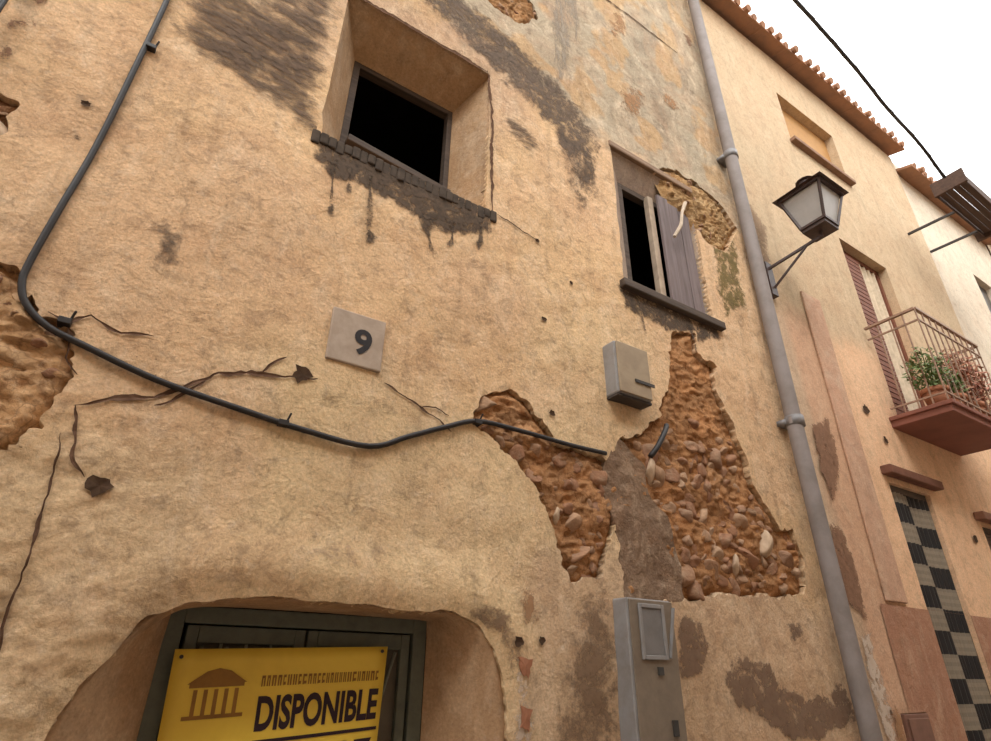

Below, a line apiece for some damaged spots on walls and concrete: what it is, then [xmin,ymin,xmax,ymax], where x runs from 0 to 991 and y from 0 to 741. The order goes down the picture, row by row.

flaking render [0,100,18,135]
damp [175,0,336,131]
flaking render [488,0,536,24]
damp [426,0,601,206]
damp [314,140,492,251]
flaking render [655,171,732,250]
flaking render [0,267,75,450]
crack [48,311,153,374]
crack [0,357,318,650]
flaking render [473,391,630,582]
flaking render [620,334,801,601]
damp [725,657,856,741]